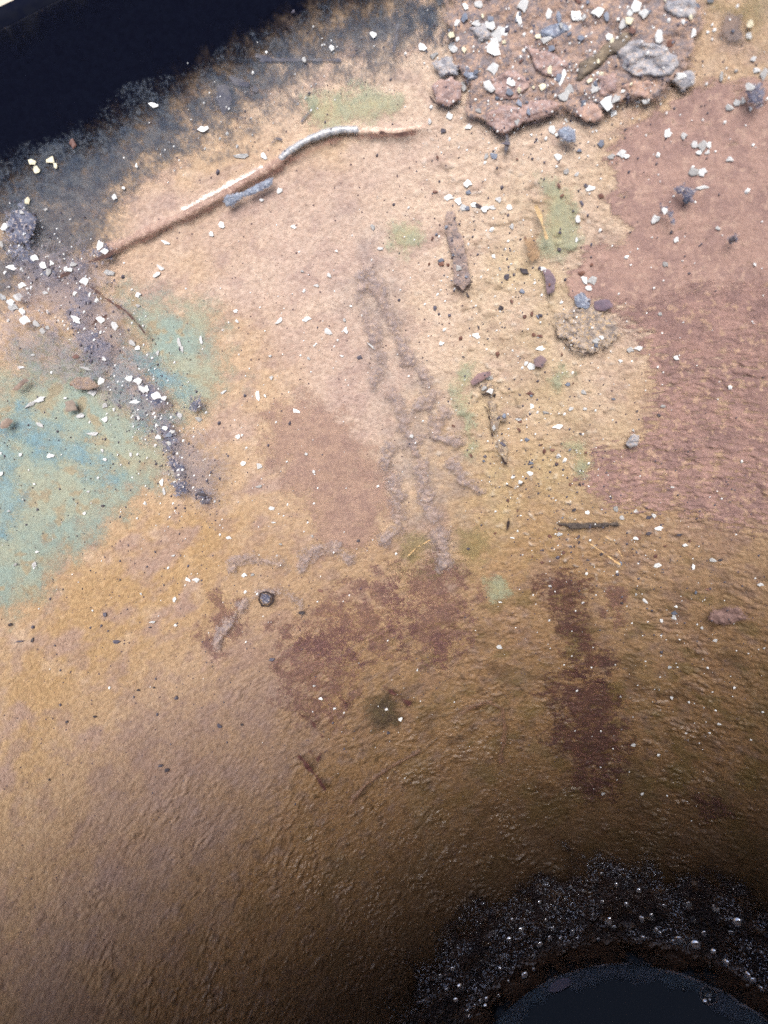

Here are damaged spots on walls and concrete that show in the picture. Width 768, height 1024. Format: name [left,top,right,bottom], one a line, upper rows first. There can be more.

rust [428,0,768,800]